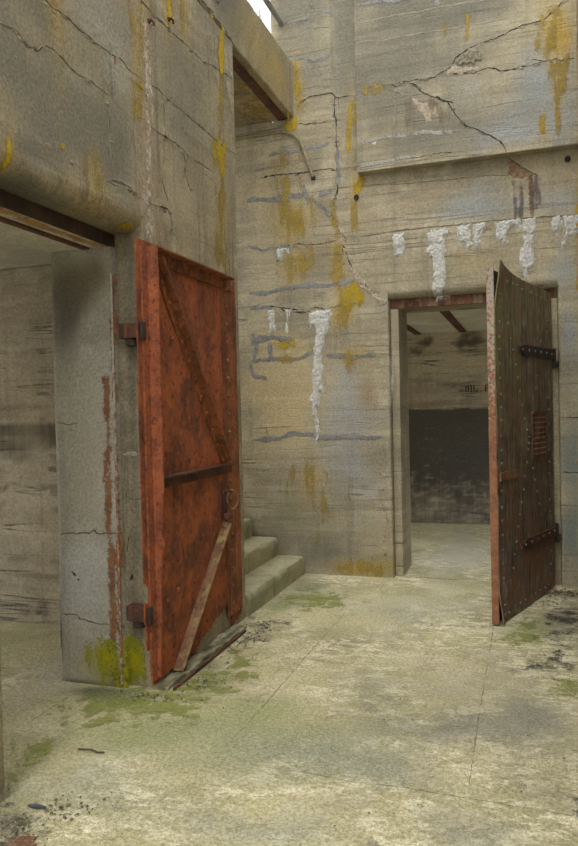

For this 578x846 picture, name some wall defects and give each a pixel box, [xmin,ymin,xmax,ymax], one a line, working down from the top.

crack [0,22,110,96]
crack [43,0,235,236]
crack [248,0,578,314]
leakage [538,57,570,136]
leakage [392,233,405,262]
leakage [426,176,541,300]
leakage [309,309,332,444]
rust [102,274,124,684]